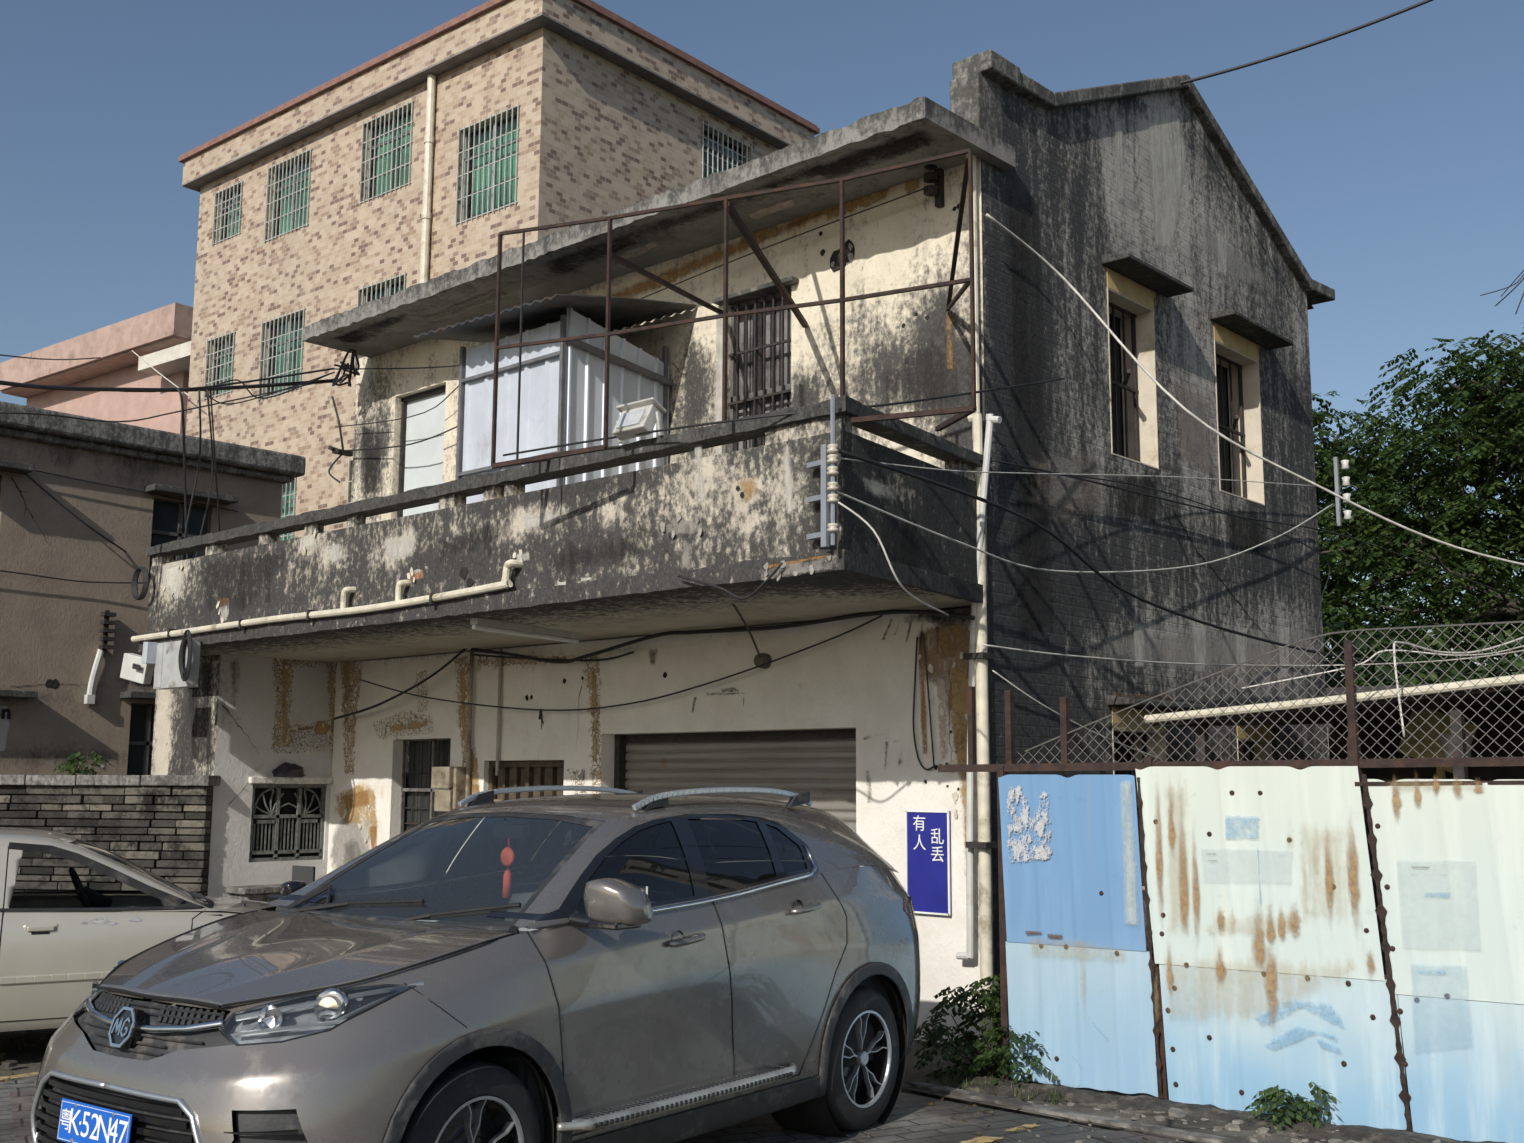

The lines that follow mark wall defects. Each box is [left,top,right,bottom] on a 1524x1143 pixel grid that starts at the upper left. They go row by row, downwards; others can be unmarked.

water stain [1148,107,1186,248]
water stain [613,189,887,297]
water stain [524,512,562,529]
water stain [1105,626,1308,678]
peeling [271,658,433,775]
peeling [917,625,977,842]
peeling [1006,786,1052,863]
rust [1156,804,1199,924]
rust [1325,841,1359,910]
rust [1393,779,1482,815]
rust [1216,954,1225,979]
rust [1253,912,1299,1014]